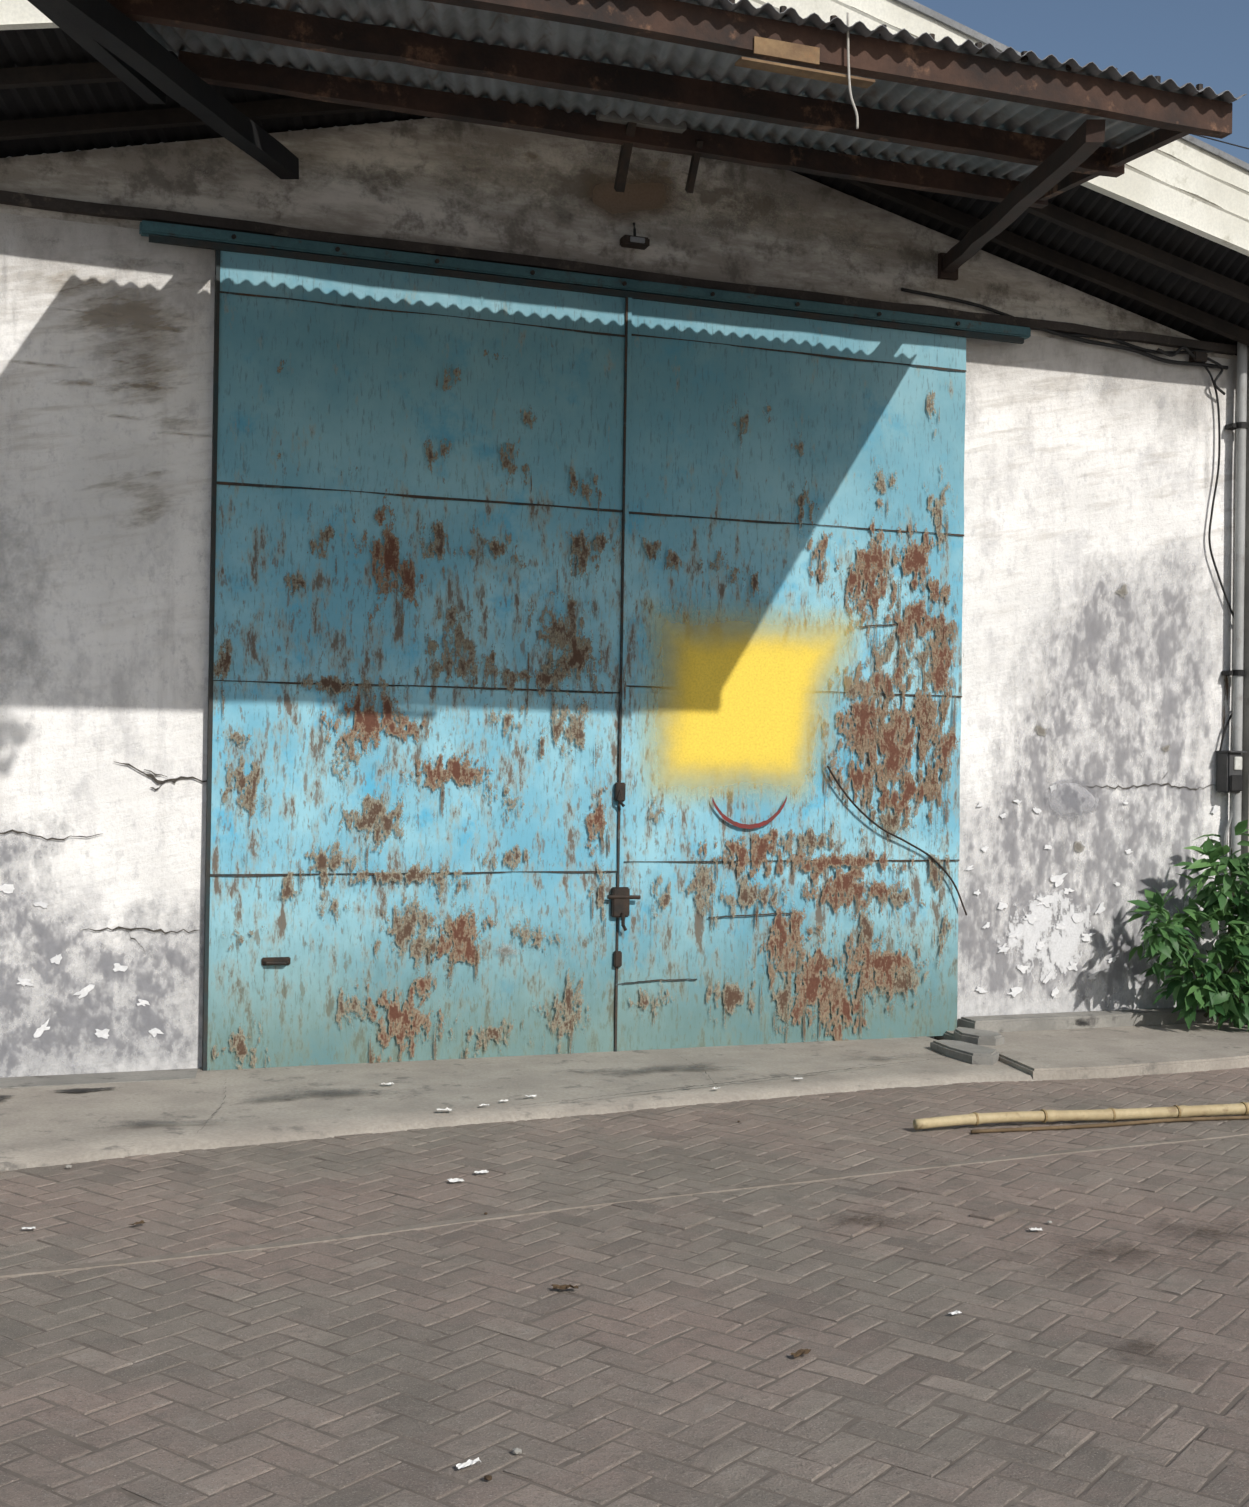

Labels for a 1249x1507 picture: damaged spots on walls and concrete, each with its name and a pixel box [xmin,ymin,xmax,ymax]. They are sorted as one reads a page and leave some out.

crack [0,829,100,840]
crack [114,761,207,791]
rust [213,626,232,713]
rust [217,731,267,827]
rust [281,674,591,1064]
rust [307,467,626,937]
rust [639,457,964,1043]
water stain [957,557,1213,1003]
crack [1079,770,1216,790]
water stain [0,834,200,1078]
crack [83,926,198,952]
peeling [982,873,1117,998]